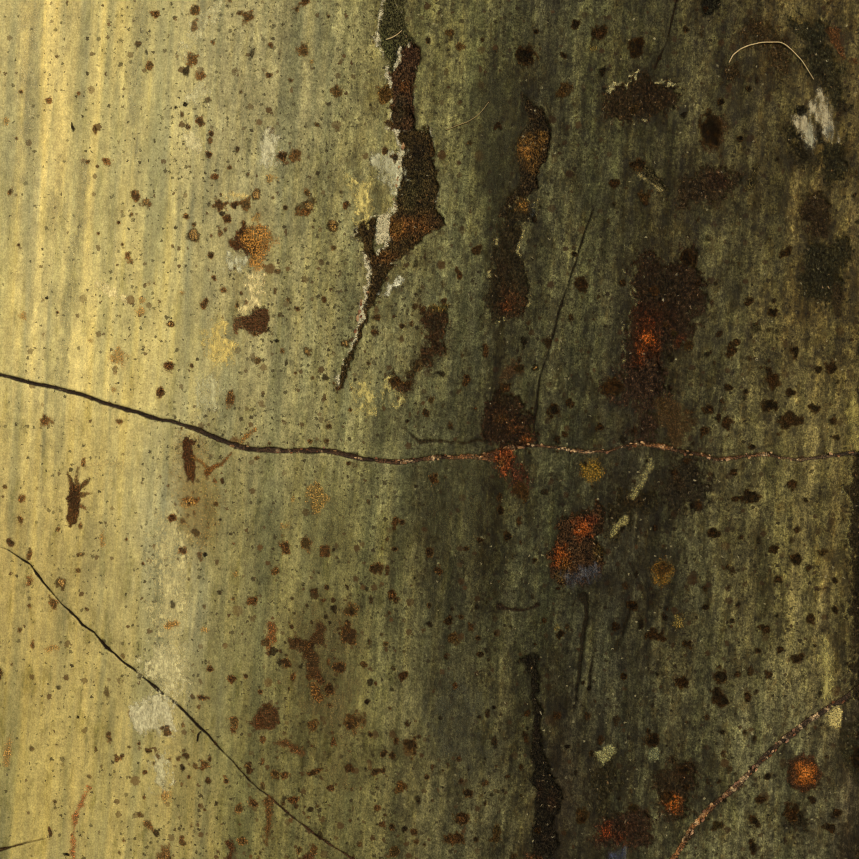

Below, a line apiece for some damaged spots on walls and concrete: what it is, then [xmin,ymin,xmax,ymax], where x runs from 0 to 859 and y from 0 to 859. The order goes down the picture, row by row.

corrosion [183,174,317,354]
spalling [336,0,445,388]
spalling [384,299,452,403]
crack [0,209,859,465]
spalling [482,92,552,324]
corrosion [56,457,91,532]
corrosion [167,427,257,537]
corrosion [494,448,549,545]
crack [7,549,354,859]
crack [670,685,859,859]
corrosion [783,752,829,822]